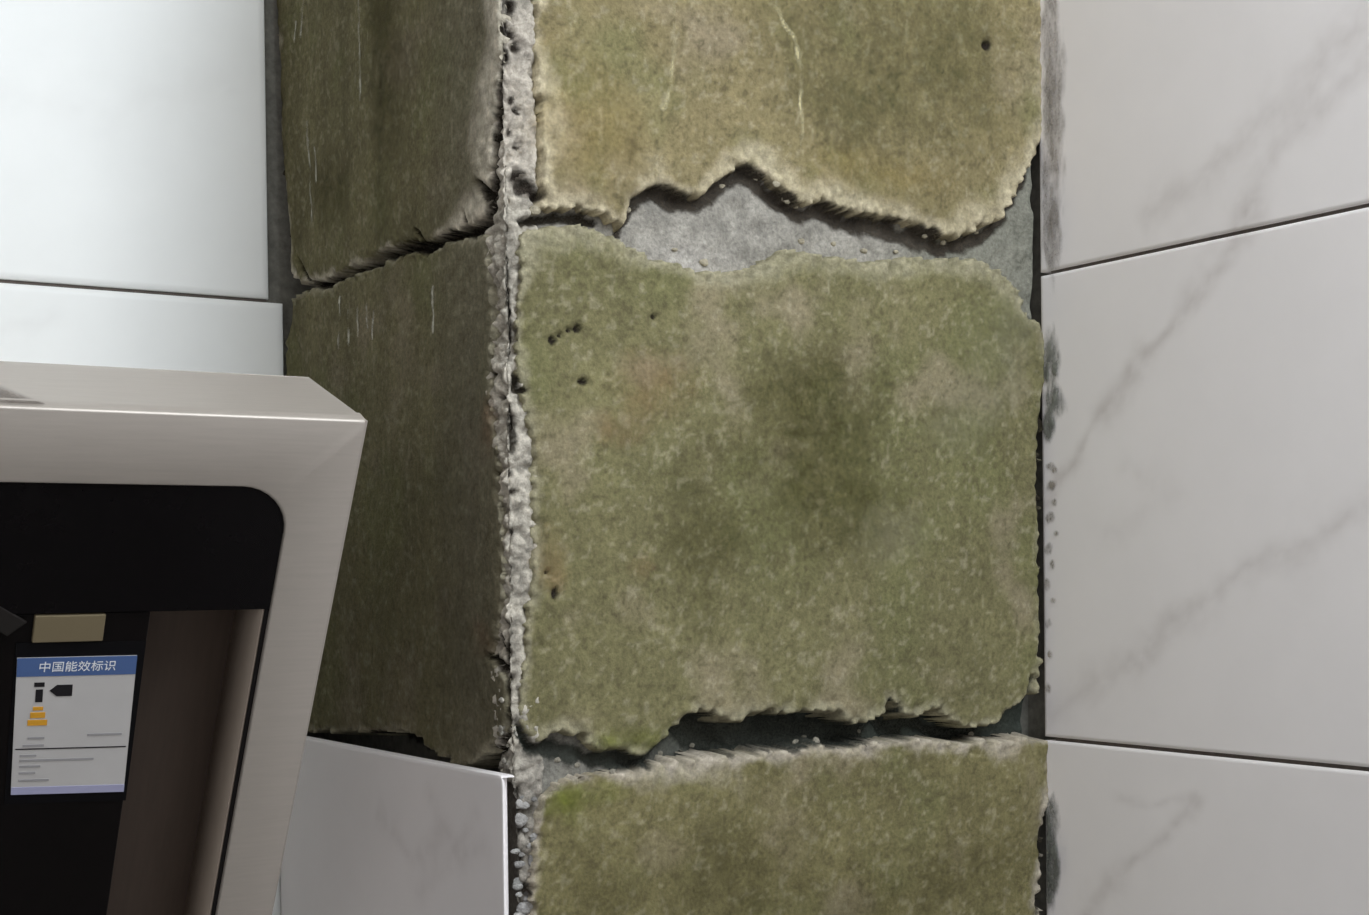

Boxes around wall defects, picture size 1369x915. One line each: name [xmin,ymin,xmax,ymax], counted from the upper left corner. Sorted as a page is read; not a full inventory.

crack [304,63,1039,452]
spalling [510,165,1033,319]
crack [1035,412,1043,462]
crack [371,730,430,749]
crack [490,623,976,770]